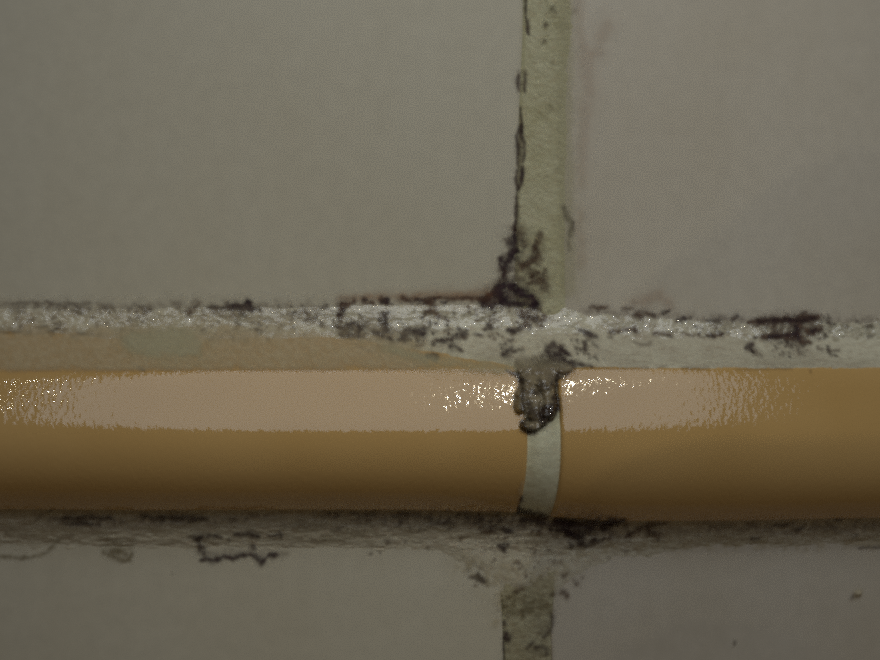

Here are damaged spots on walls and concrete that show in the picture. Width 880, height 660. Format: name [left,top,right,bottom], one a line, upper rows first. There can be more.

leakage [515,114,524,189]
leakage [208,300,254,310]
leakage [746,312,827,352]
leakage [507,329,597,434]
leakage [195,532,277,564]
leakage [517,497,625,548]